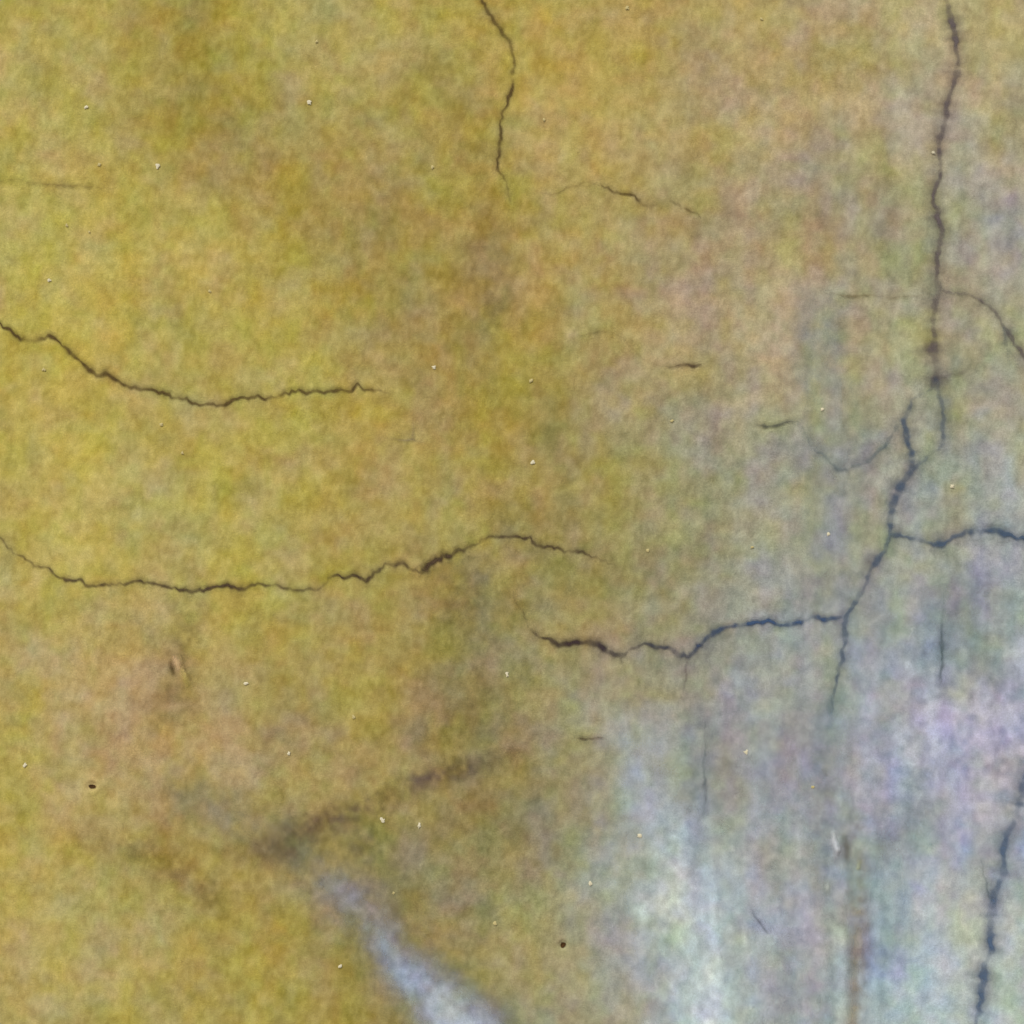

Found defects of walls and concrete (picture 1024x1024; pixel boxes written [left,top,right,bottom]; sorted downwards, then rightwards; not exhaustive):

crack [496,84,514,169]
crack [927,6,959,383]
crack [0,322,373,406]
crack [872,418,1024,567]
crack [48,567,303,592]
crack [333,548,464,582]
crack [542,600,857,683]
leakage [840,614,1024,972]
leakage [628,728,851,1024]
crack [990,830,1010,905]
leakage [319,875,504,1024]
crack [976,931,995,1012]